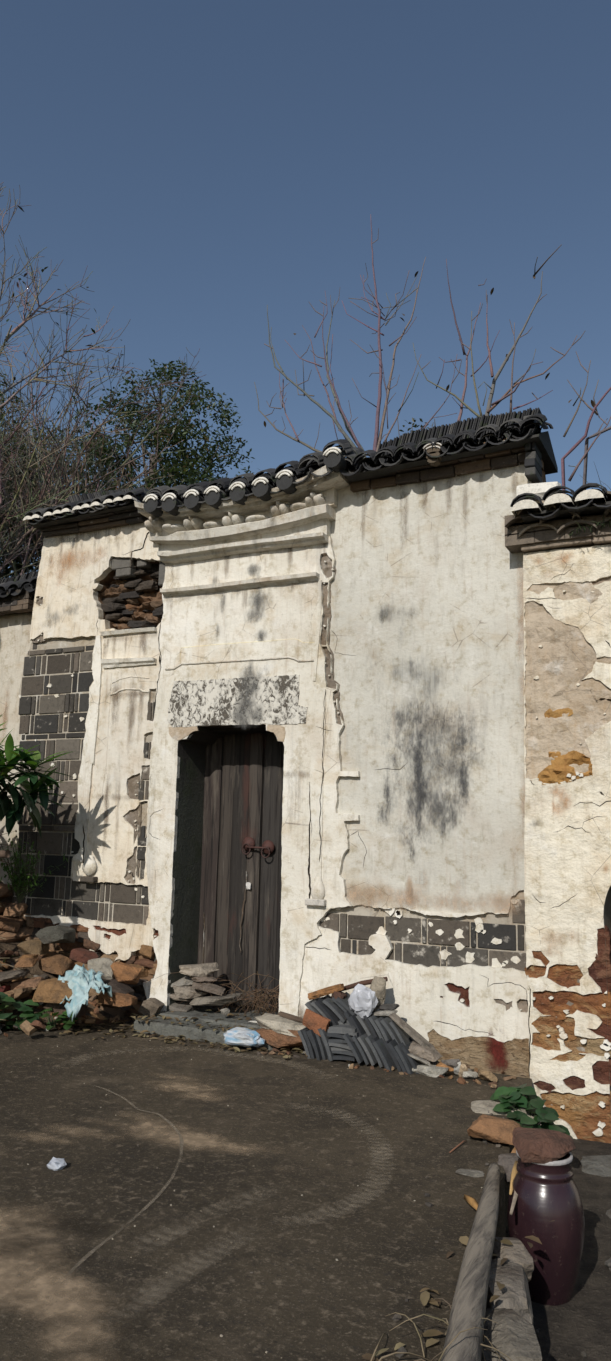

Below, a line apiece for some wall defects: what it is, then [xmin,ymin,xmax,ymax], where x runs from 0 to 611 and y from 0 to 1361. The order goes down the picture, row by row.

spalling [101,557,165,630]
peeling [523,576,611,785]
peeling [10,632,159,1021]
peeling [169,726,199,740]
damp [409,718,467,822]
crack [557,801,608,833]
peeling [320,890,611,1143]